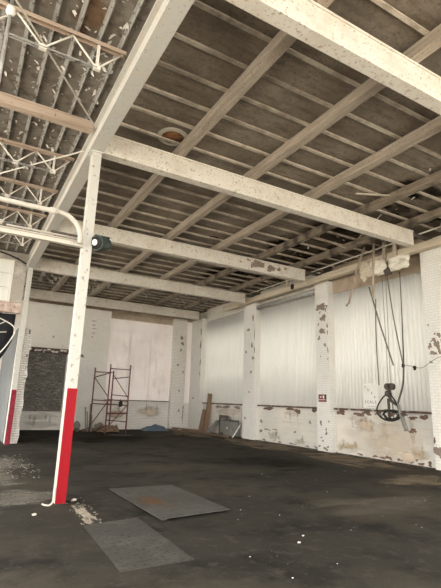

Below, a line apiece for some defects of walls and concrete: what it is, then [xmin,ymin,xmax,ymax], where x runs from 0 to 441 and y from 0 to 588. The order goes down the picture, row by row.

peeling [316,302,329,360]
peeling [428,333,441,355]